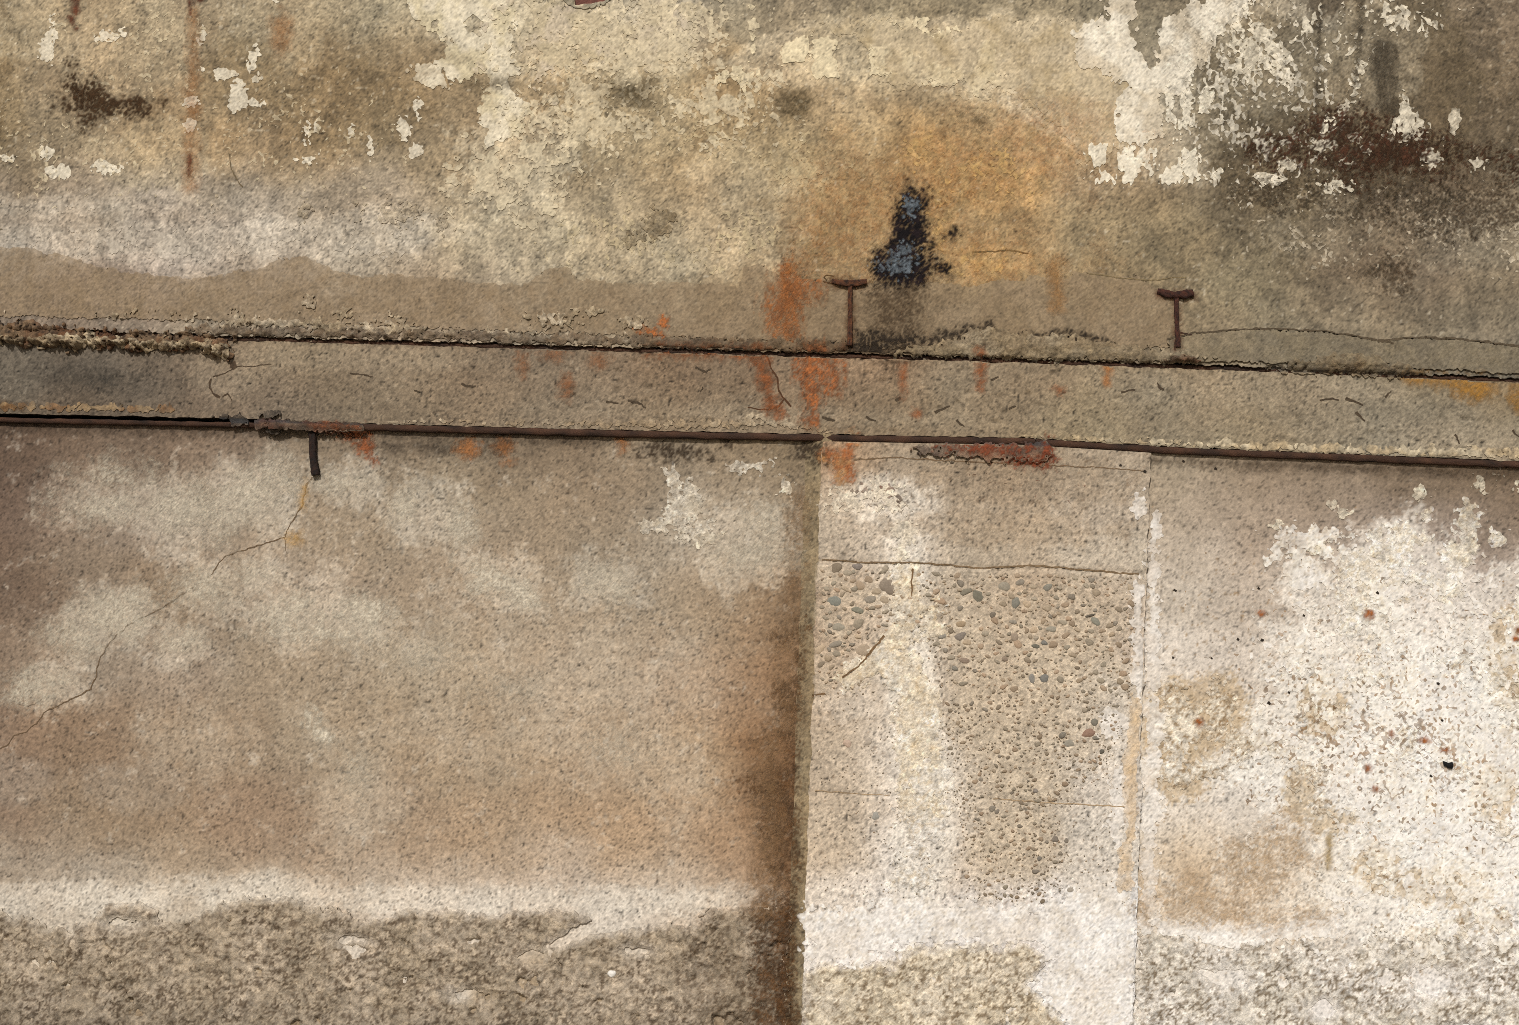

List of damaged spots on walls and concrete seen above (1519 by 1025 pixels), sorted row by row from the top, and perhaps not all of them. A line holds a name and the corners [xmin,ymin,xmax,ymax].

leakage [51,60,168,134]
peeling [0,0,1519,284]
leakage [1229,173,1519,241]
corrosion [764,258,853,427]
spalling [1320,397,1365,421]
corrosion [931,436,1086,508]
crack [0,477,312,749]
leakage [257,592,399,642]
leakage [467,565,540,609]
leakage [300,708,335,743]
spalling [797,429,1519,1025]
leakage [1164,826,1321,926]